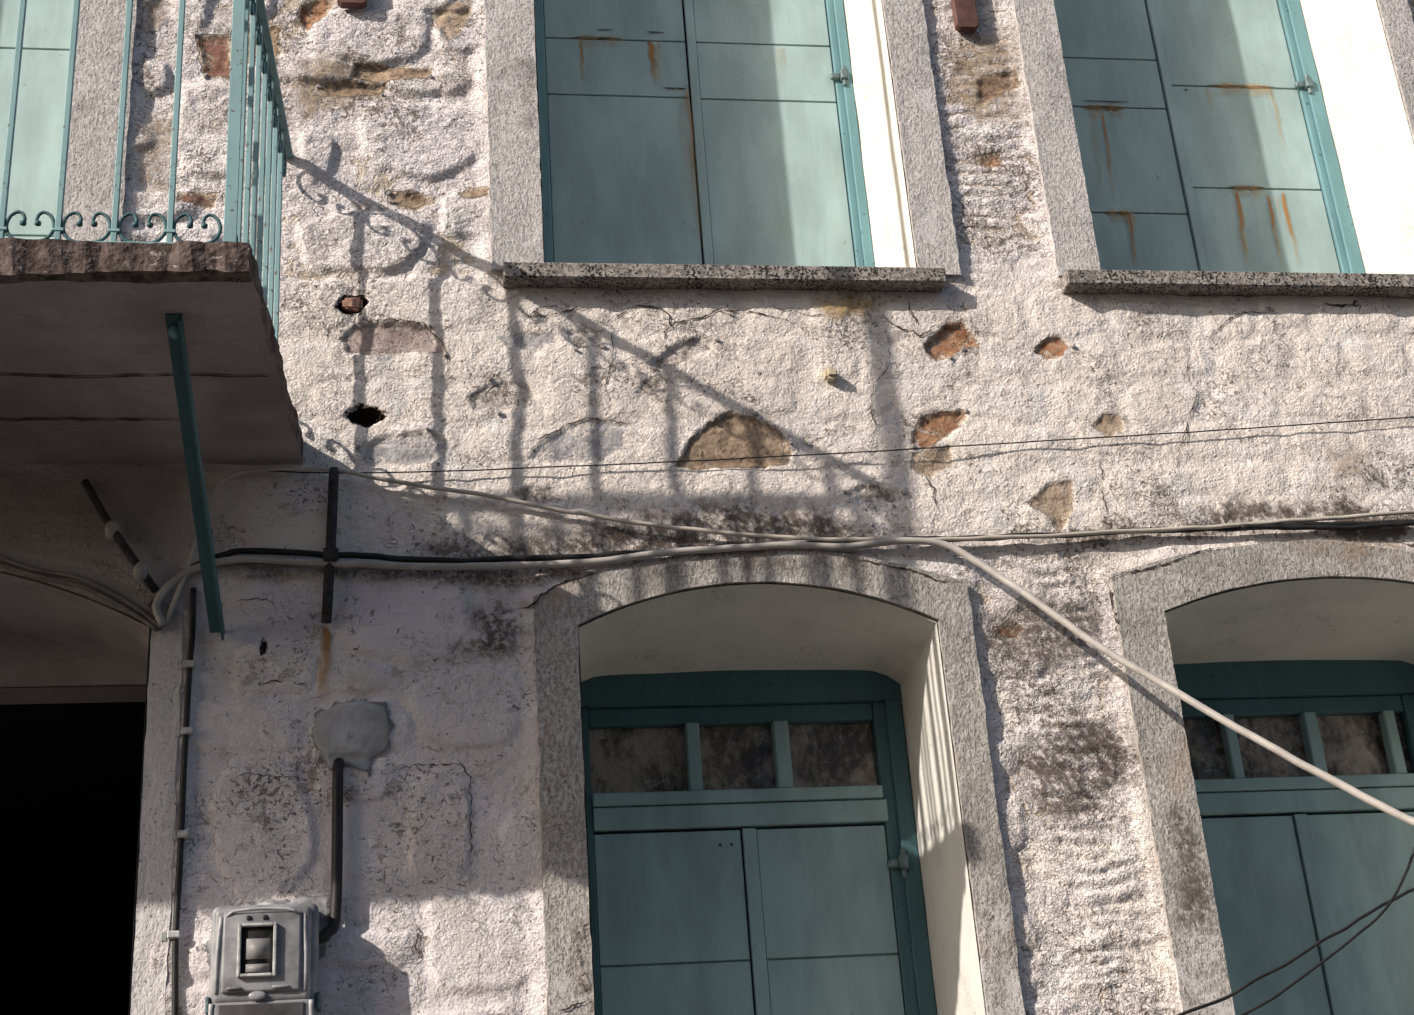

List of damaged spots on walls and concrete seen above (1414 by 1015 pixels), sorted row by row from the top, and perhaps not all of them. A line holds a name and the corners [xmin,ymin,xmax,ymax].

rust [574,29,622,70]
rust [647,31,691,120]
rust [1081,100,1126,168]
rust [1104,210,1135,257]
rust [1230,186,1293,241]
spalling [924,321,976,361]
spalling [1032,337,1076,358]
crack [511,298,824,456]
spalling [345,403,387,428]
spalling [355,427,455,465]
spalling [677,410,793,470]
spalling [910,409,969,473]